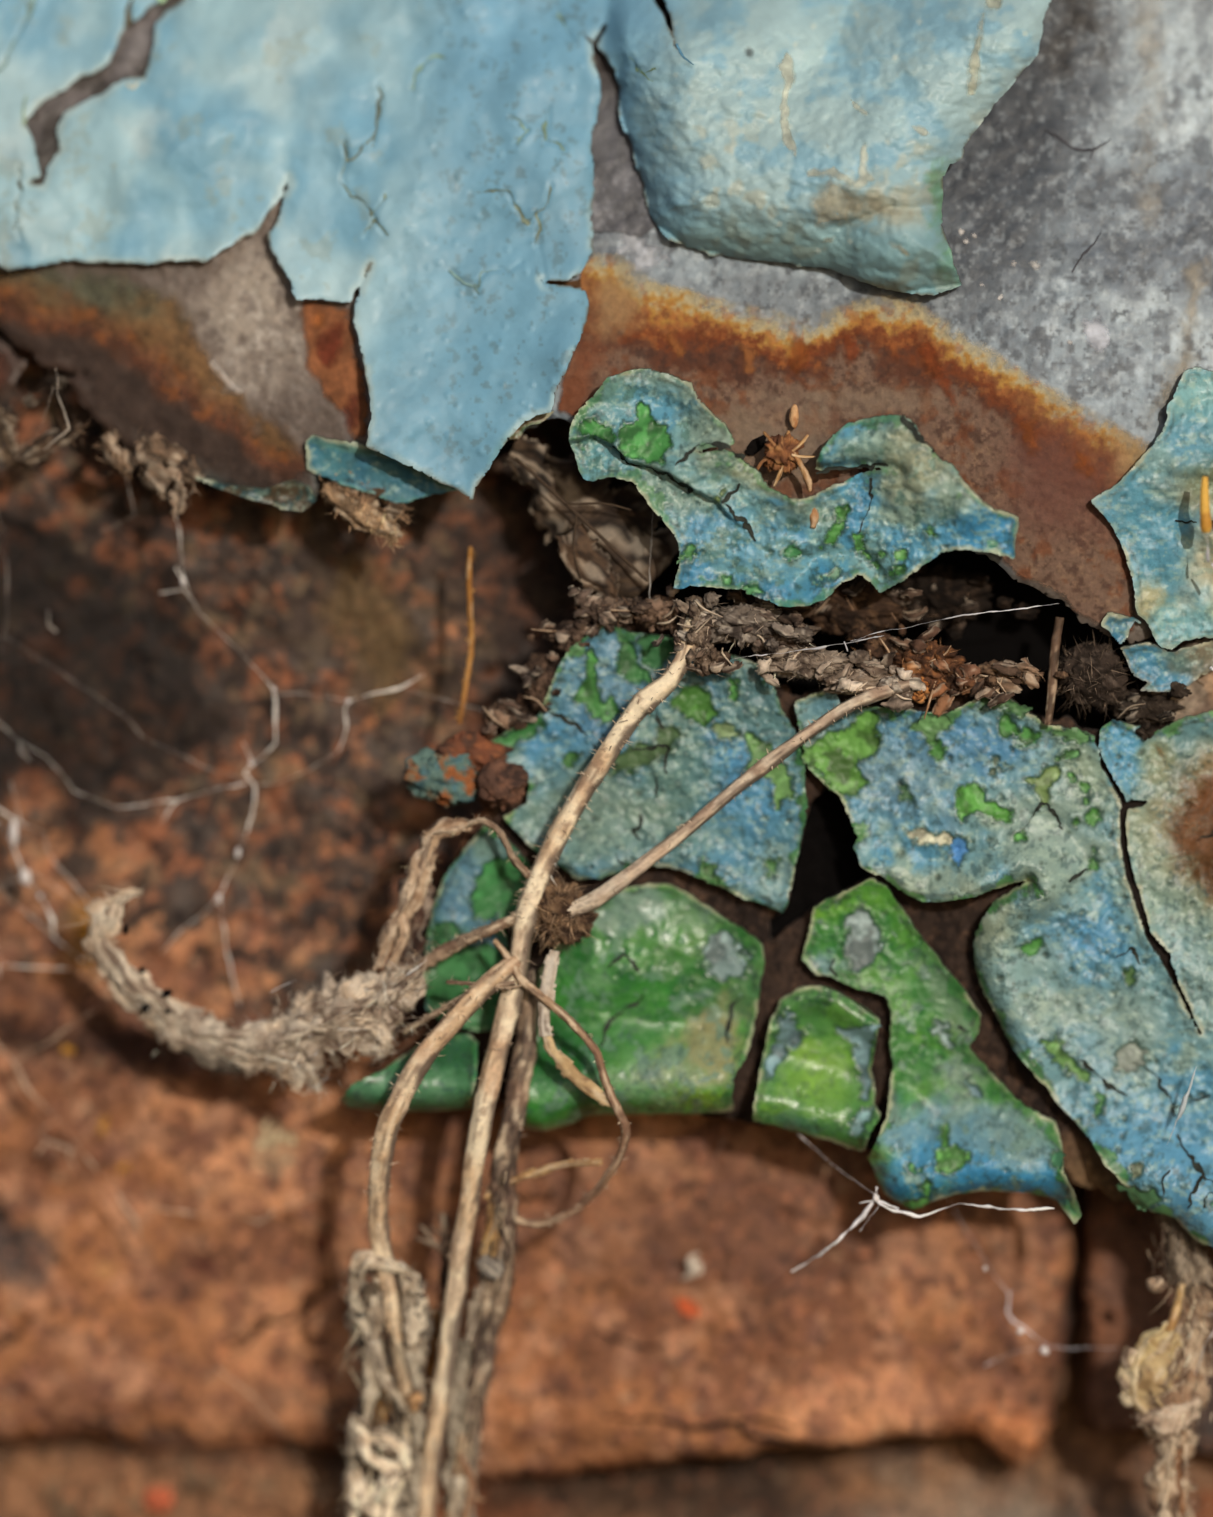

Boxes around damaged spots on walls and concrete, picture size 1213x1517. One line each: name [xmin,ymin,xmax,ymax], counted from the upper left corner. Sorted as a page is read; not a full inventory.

crack [0,0,182,228]
rust [0,270,304,489]
rust [302,300,369,438]
crack [476,185,552,246]
peeling [0,0,1051,512]
crack [546,279,581,288]
crack [513,0,694,236]
rust [558,257,1146,631]
peeling [423,366,1213,1247]
rust [1175,779,1213,893]
peeling [340,1044,420,1113]
peeling [407,990,501,1112]